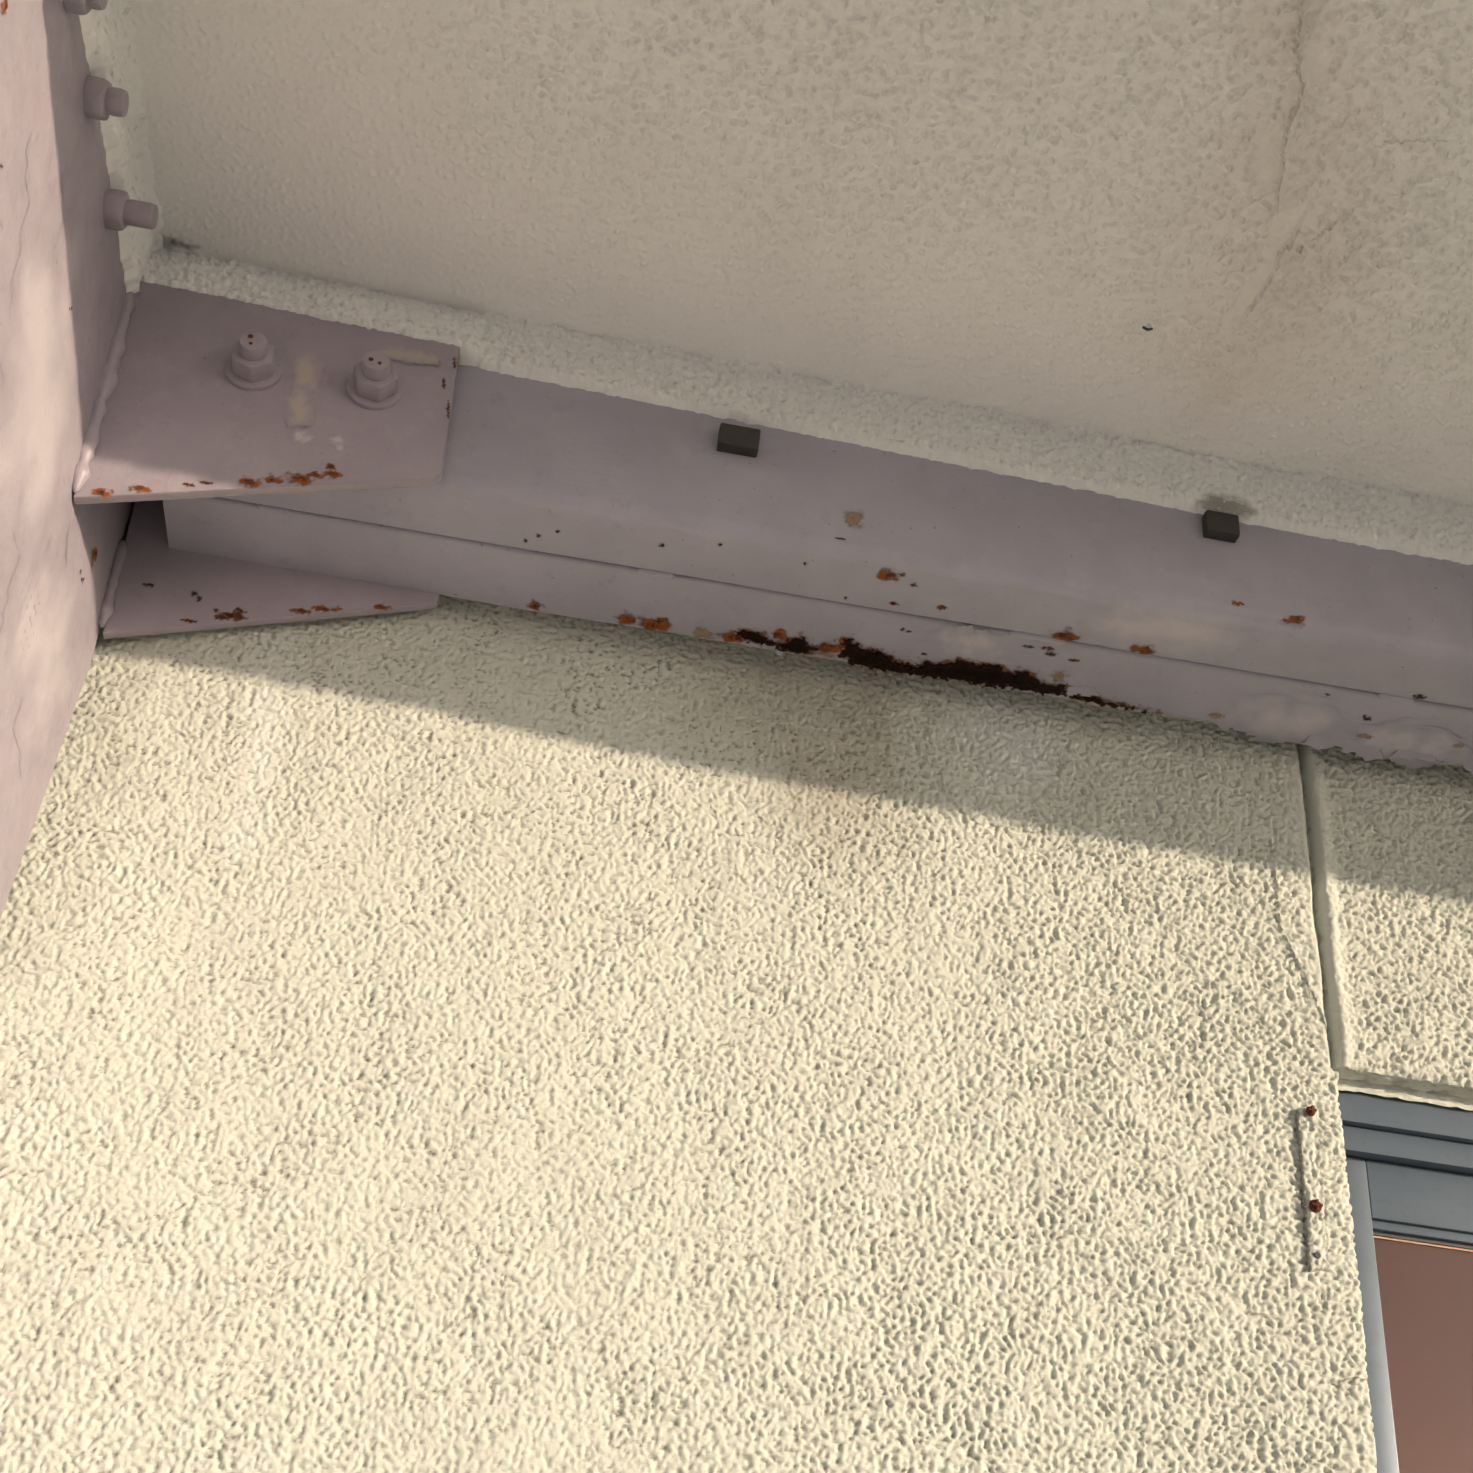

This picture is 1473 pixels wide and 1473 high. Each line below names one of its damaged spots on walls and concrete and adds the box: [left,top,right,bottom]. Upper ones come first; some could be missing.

crack [1225,0,1334,317]
rust [239,463,343,488]
rust [92,485,151,498]
rust [835,512,863,540]
rust [877,569,917,587]
rust [180,607,248,623]
rust [289,605,342,614]
rust [1283,616,1305,624]
rust [694,628,1162,716]